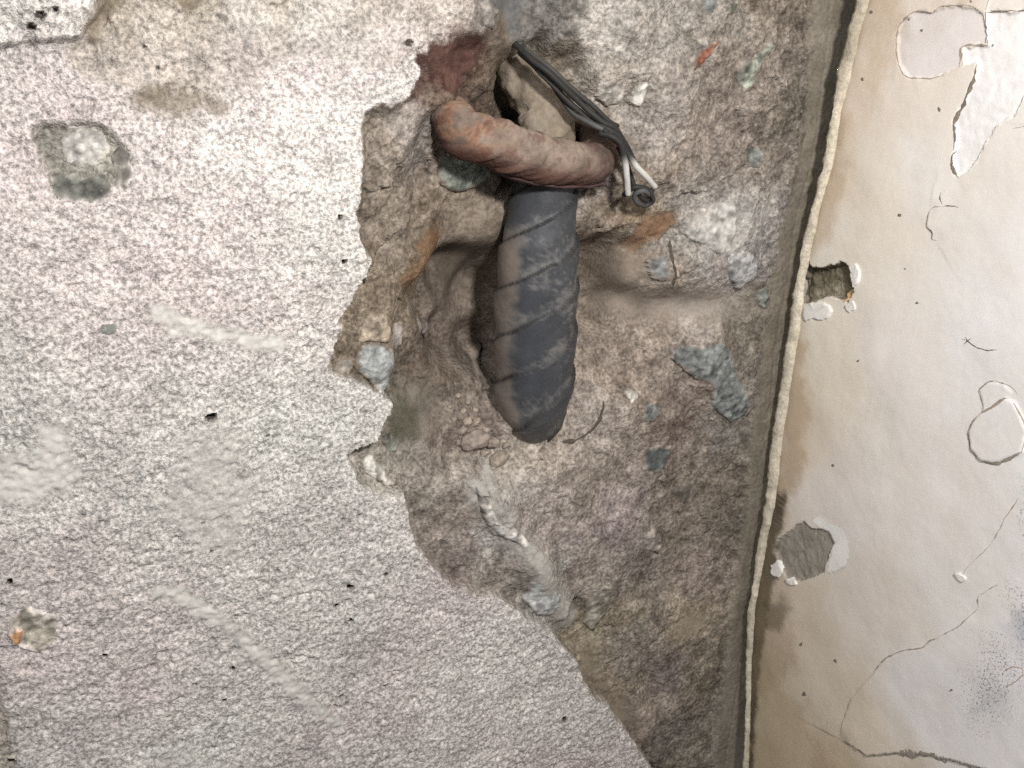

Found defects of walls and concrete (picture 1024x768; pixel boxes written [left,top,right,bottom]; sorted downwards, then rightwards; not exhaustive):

corrosion [416,34,484,96]
peeling [895,0,1024,177]
spalling [58,0,870,768]
crack [962,497,1019,575]
crack [874,585,998,673]